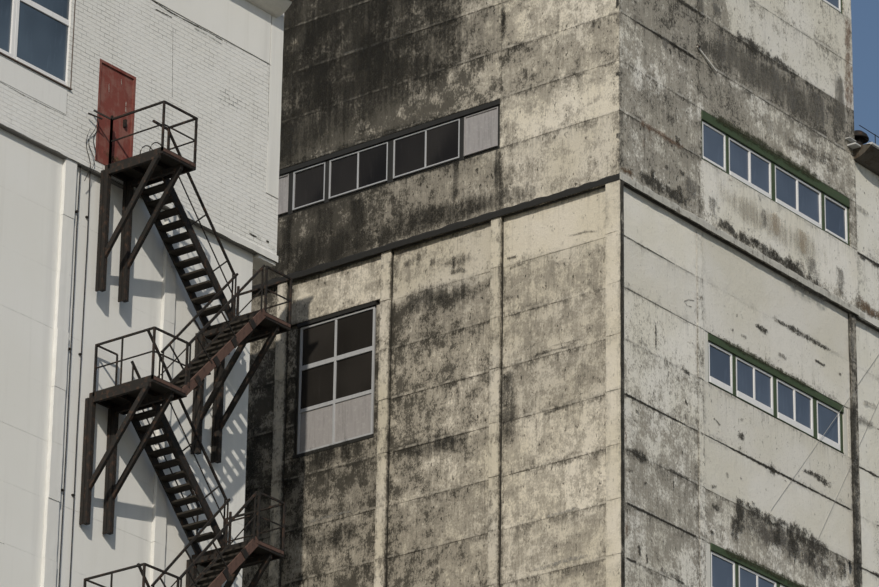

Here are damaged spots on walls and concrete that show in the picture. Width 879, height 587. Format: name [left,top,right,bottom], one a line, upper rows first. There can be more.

leakage [280,0,468,167]
leakage [714,31,839,134]
leakage [270,150,535,279]
leakage [407,283,465,313]
leakage [640,165,696,207]
leakage [718,198,844,301]
leakage [244,417,258,528]
leakage [290,440,358,469]
leakage [408,436,466,461]
leakage [502,371,515,436]
leakage [723,398,876,587]